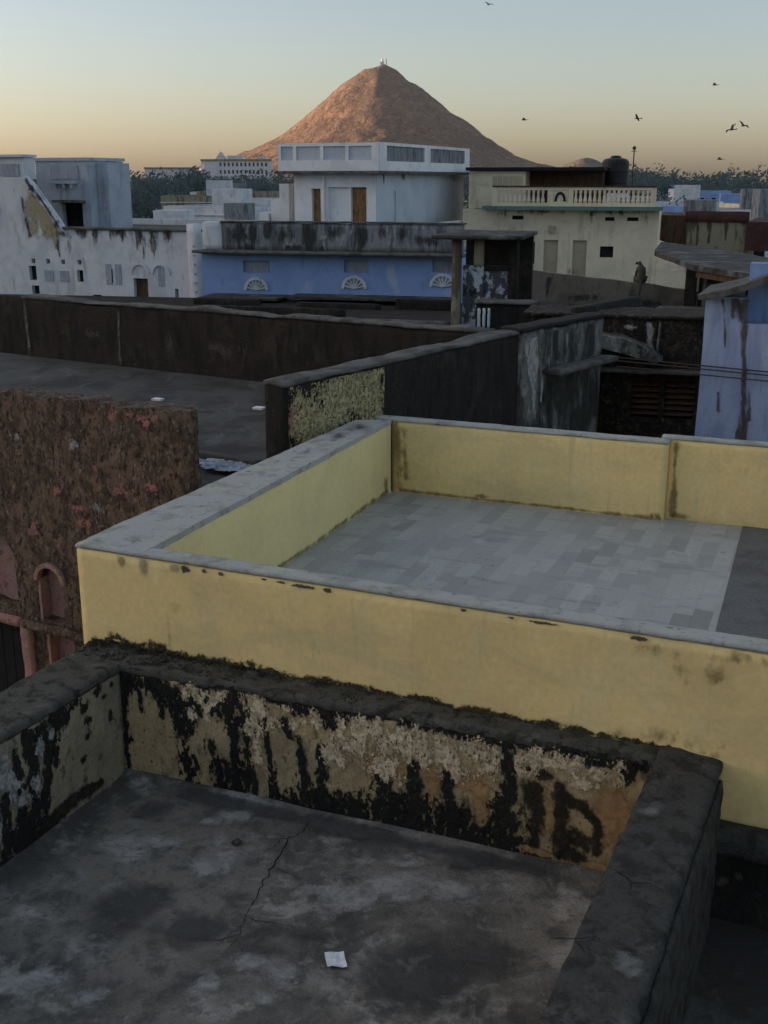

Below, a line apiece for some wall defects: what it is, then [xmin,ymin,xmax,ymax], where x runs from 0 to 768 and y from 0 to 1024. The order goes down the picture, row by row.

leakage [228,223,339,250]
leakage [353,224,438,251]
leakage [721,298,751,440]
leakage [278,429,585,567]
leakage [604,443,684,520]
leakage [0,665,649,872]
crack [205,820,309,954]